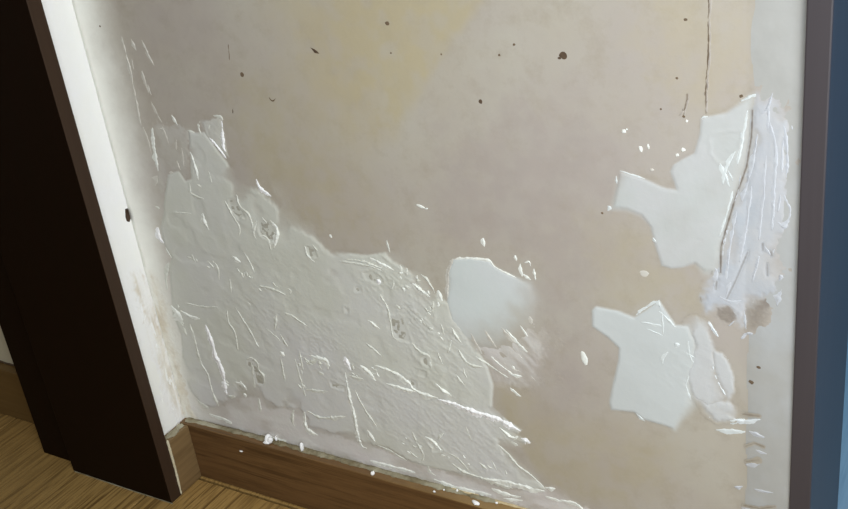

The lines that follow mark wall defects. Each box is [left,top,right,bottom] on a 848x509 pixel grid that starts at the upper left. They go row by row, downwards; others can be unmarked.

crack [678,0,712,118]
peeling [122,264,206,425]